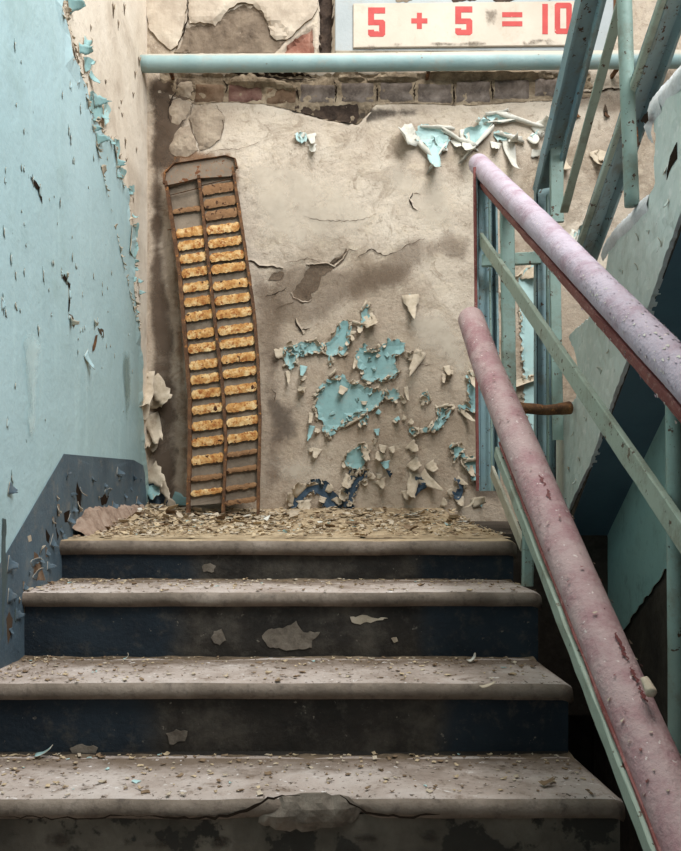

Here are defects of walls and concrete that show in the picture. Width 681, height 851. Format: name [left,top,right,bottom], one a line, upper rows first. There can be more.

spalling [146,0,318,54]
peeling [62,0,146,331]
spalling [160,70,558,174]
peeling [43,252,116,370]
leakage [150,79,196,499]
spalling [290,249,349,303]
peeling [402,294,419,319]
peeling [274,300,487,509]
spalling [2,369,186,643]
spalling [262,621,320,651]
spalling [350,615,386,624]
crack [13,792,440,832]